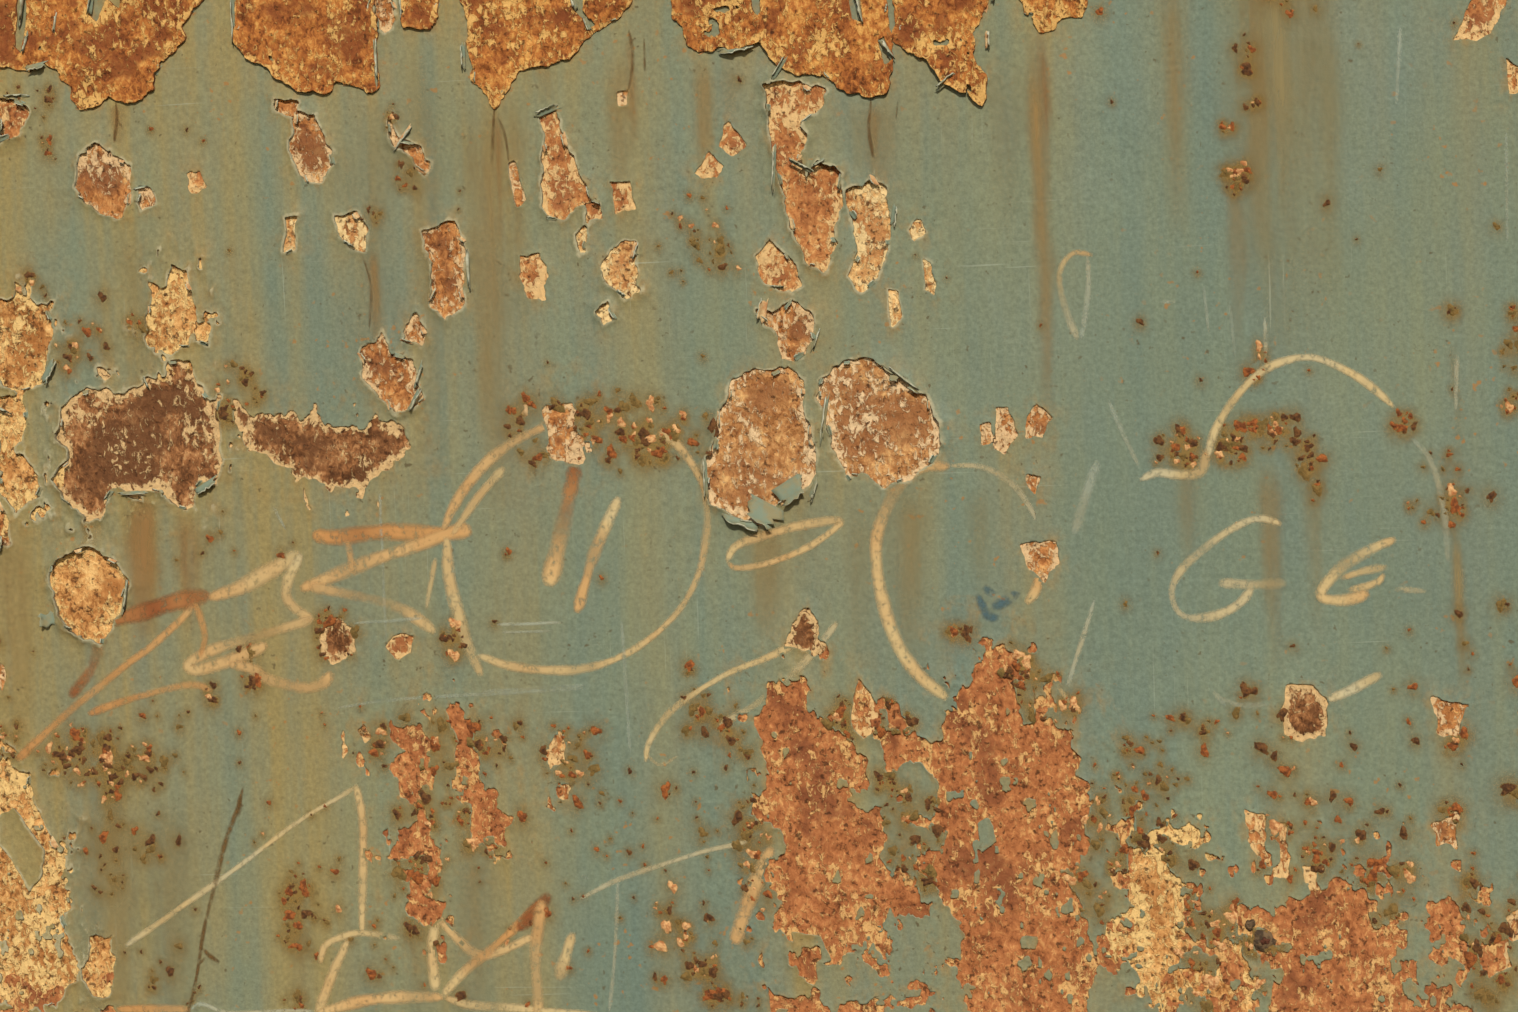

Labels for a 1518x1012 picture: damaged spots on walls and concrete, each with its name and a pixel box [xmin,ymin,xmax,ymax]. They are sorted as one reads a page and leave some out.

peeling [1453,0,1507,41]
peeling [1506,58,1518,94]
peeling [695,81,941,531]
corrosion [1499,304,1518,415]
peeling [0,259,232,644]
corrosion [1153,412,1328,502]
corrosion [782,608,829,673]
peeling [0,740,116,1007]
corrosion [626,624,1518,1012]
peeling [1101,801,1271,1012]
corrosion [0,972,116,1012]
corrosion [147,959,174,991]